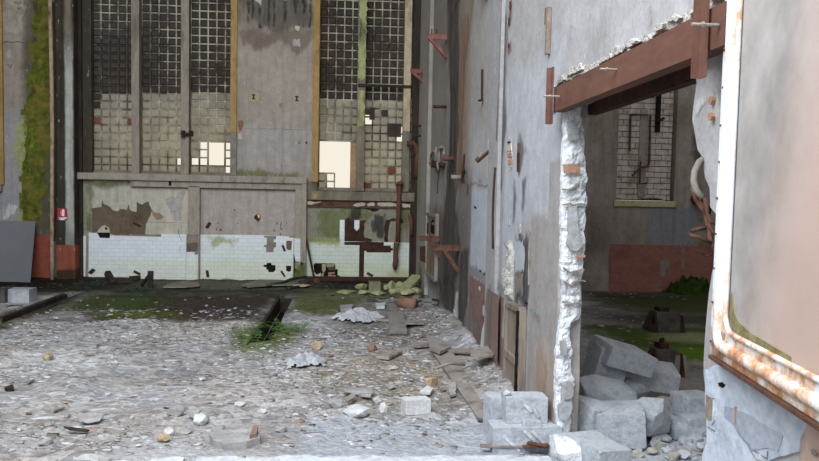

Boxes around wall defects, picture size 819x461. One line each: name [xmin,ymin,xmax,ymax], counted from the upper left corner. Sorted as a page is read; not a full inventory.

flaking render [554,9,693,88]
damp [439,0,508,347]
peeling [92,196,164,238]
peeling [186,234,199,254]
flaking render [502,240,515,302]
spalling [548,99,588,461]
rust [688,187,716,253]
flaking render [702,365,817,461]